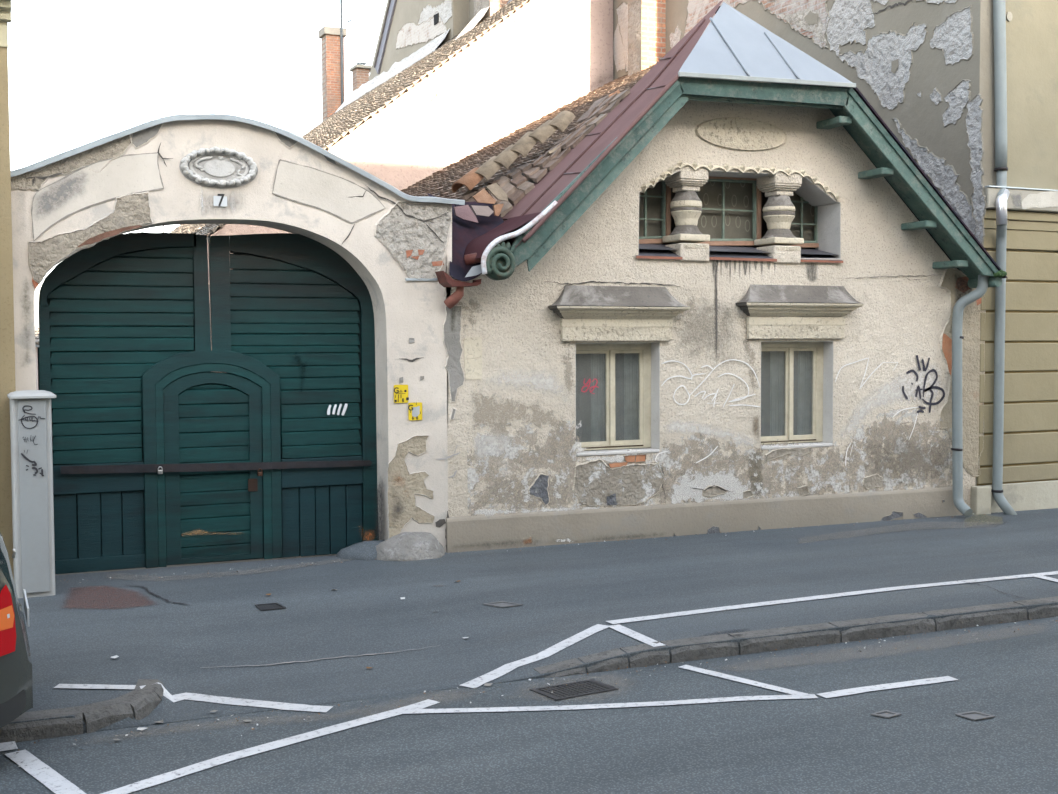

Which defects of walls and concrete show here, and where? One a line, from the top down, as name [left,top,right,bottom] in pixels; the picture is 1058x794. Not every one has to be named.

flaking render [11,123,164,192]
flaking render [28,191,153,289]
flaking render [374,200,452,279]
flaking render [467,268,986,516]
flaking render [387,435,446,539]